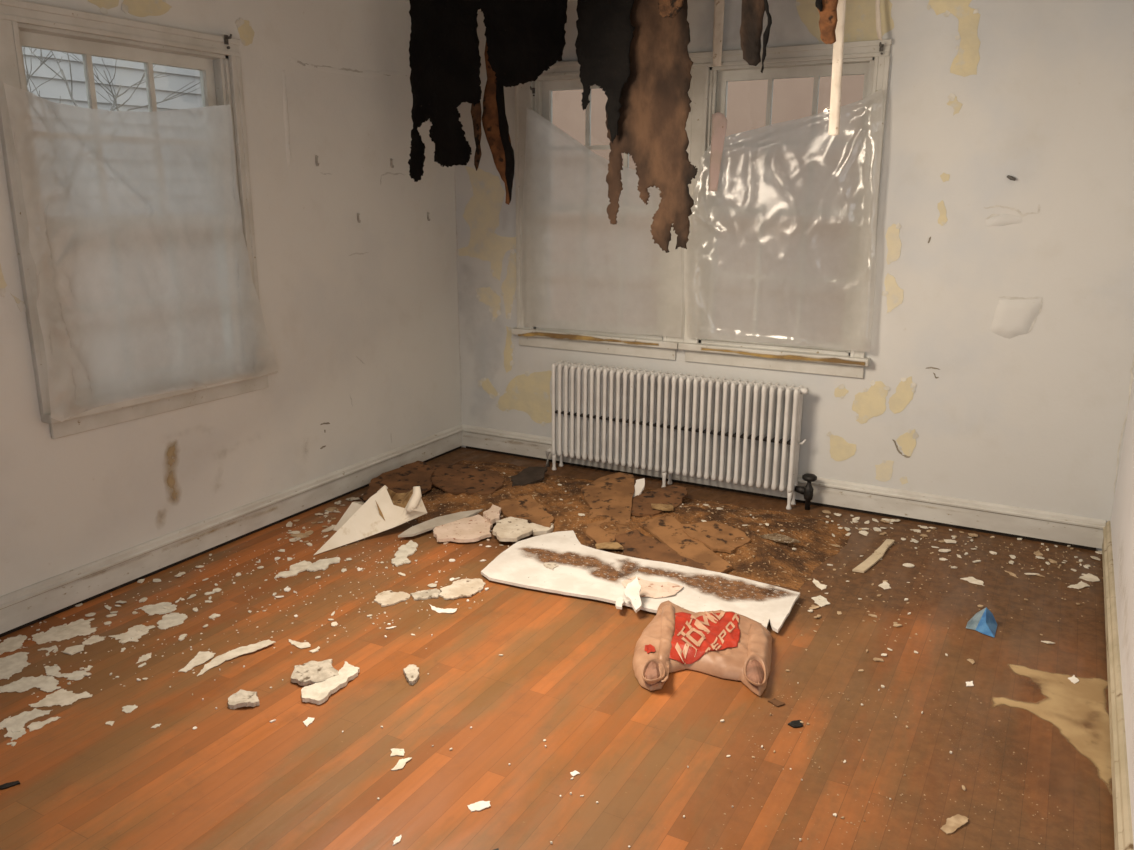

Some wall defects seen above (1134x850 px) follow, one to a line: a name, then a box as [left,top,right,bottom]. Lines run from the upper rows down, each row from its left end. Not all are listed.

peeling [795,0,825,44]
peeling [844,0,894,42]
peeling [927,0,981,77]
peeling [456,166,552,427]
peeling [834,376,917,424]
peeling [826,431,856,461]
damp [992,664,1112,794]